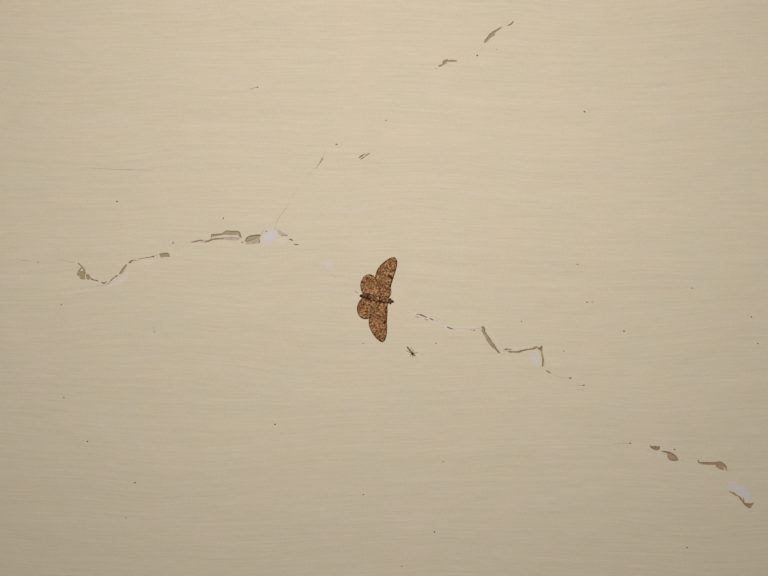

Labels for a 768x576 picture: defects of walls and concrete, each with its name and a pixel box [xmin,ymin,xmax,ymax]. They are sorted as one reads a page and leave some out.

crack [96,255,157,288]
crack [395,303,481,333]
crack [503,345,585,390]
peeling [697,460,754,508]